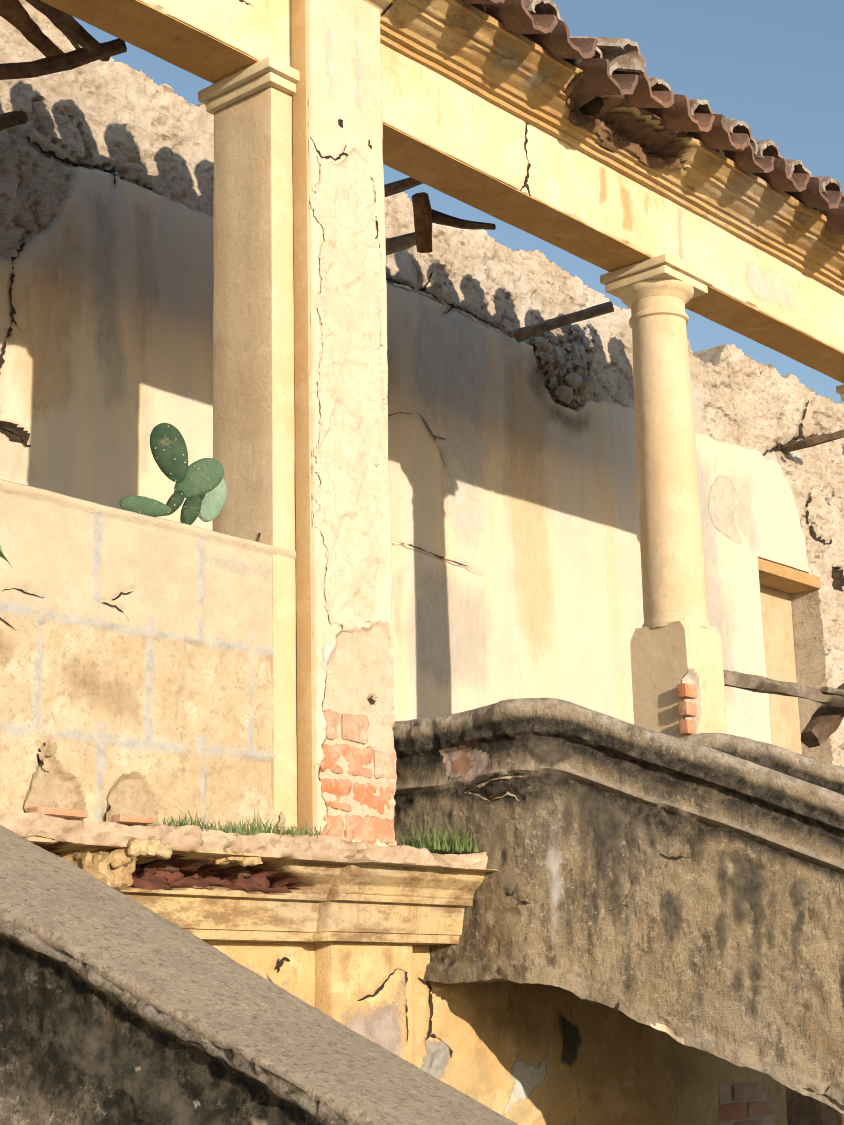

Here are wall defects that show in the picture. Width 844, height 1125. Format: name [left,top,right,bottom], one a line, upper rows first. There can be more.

crack [311,138,348,160]
crack [520,124,531,196]
crack [0,242,25,374]
flaking render [309,140,397,846]
crack [102,591,134,617]
flaking render [677,668,702,735]
leakage [502,724,572,766]
leakage [539,787,656,917]
leakage [718,850,775,952]
leakage [49,1004,240,1125]
peeling [345,1004,401,1056]
peeling [504,1053,548,1114]